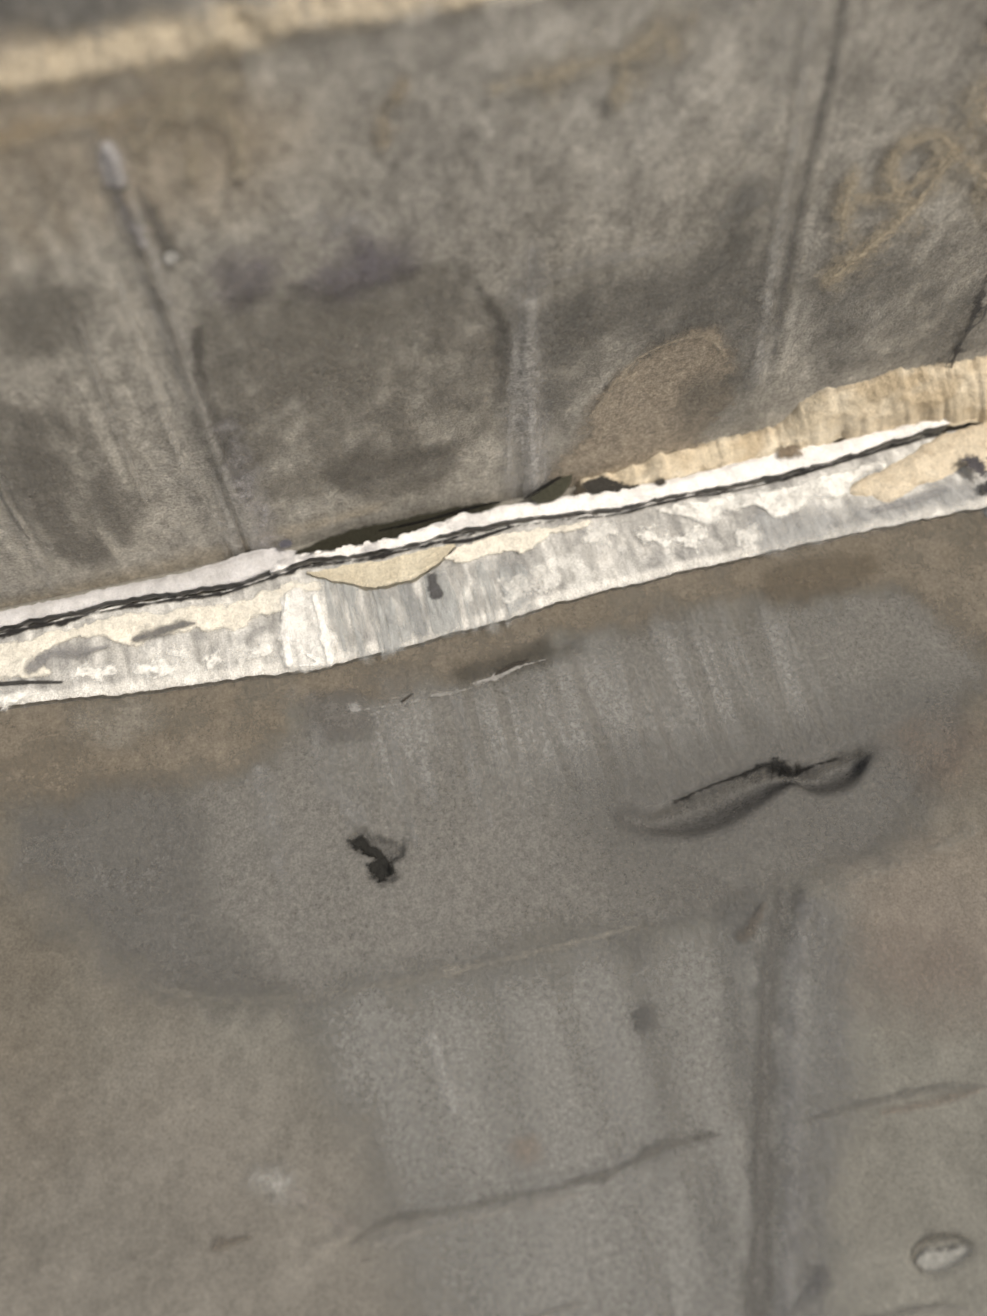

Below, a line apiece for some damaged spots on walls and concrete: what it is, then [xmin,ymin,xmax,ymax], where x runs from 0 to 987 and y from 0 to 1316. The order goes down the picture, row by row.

crack [0,679,63,687]
peeling [0,519,618,712]
damp [195,238,509,548]
crack [0,424,970,638]
damp [0,487,987,797]
spalling [524,475,573,504]
peeling [637,463,886,553]
crack [946,277,987,368]
spalling [347,832,405,883]
damp [321,890,855,1316]